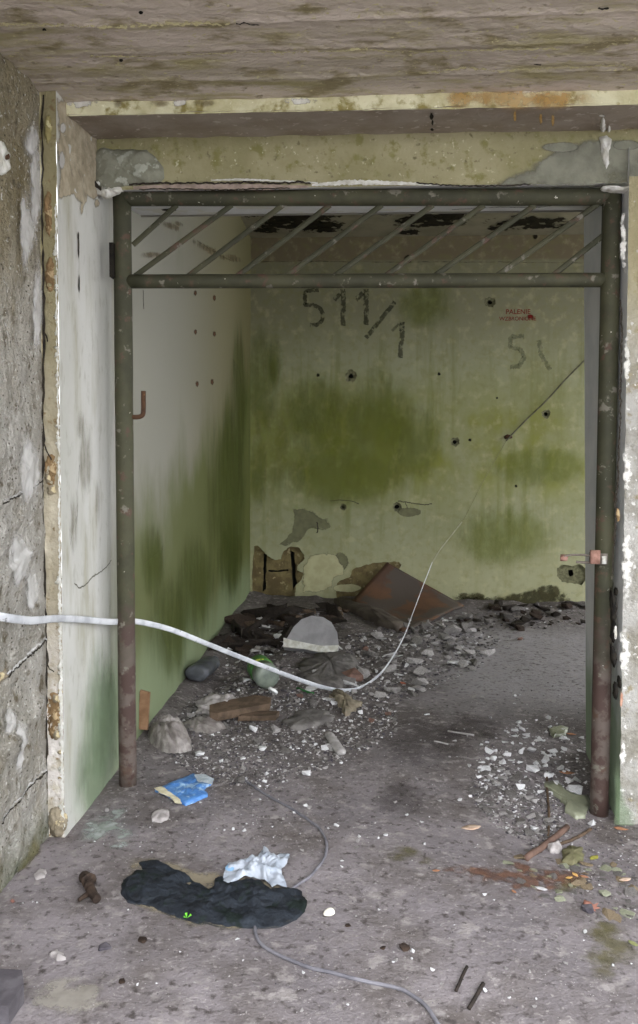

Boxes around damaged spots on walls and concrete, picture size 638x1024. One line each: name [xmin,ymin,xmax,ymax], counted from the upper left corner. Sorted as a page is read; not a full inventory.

rust [451,91,569,126]
crack [2,95,54,824]
peeling [43,100,99,838]
spalling [252,509,401,598]
peeling [393,502,421,517]
spalling [557,564,585,585]